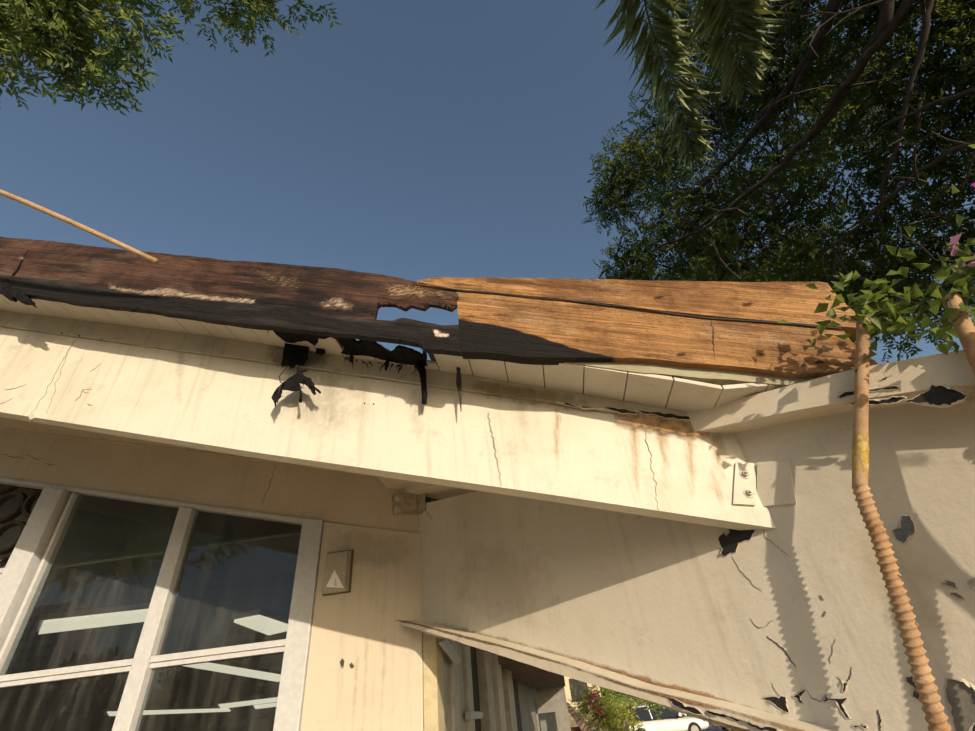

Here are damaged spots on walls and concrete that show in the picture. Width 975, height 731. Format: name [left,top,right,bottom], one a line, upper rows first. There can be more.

crack [0,339,99,414]
peeling [869,384,967,408]
crack [487,413,502,485]
crack [645,430,659,510]
rust [615,412,703,444]
peeling [717,529,756,557]
peeling [891,514,917,545]
peeling [941,577,975,601]
crack [751,619,795,666]
peeling [667,696,782,731]
peeling [762,667,868,730]
peeling [944,677,975,731]